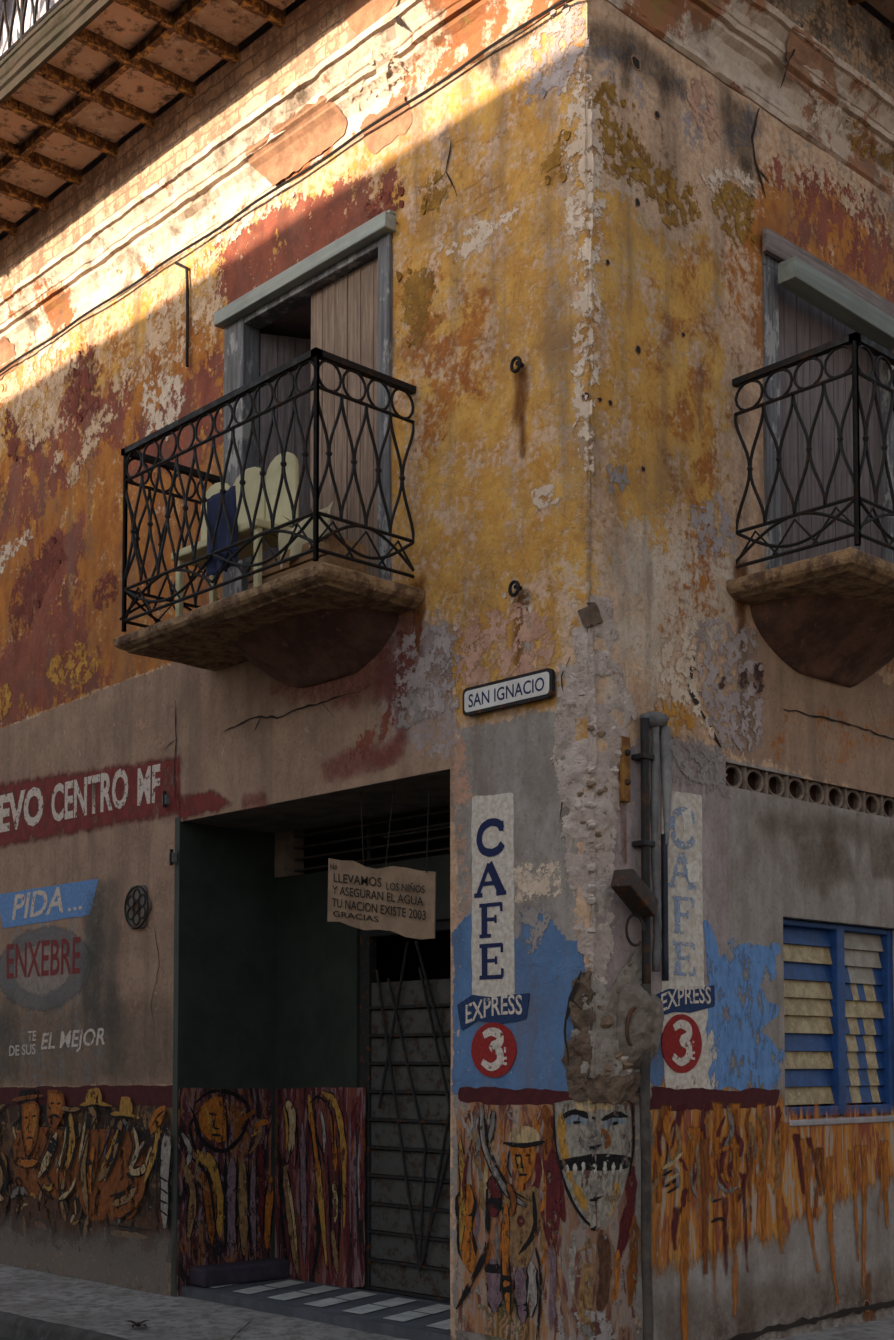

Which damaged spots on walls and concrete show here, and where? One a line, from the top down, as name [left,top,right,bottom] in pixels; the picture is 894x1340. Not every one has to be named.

crack [751,24,803,198]
flaking render [0,43,412,488]
rust [515,369,526,457]
peeling [0,529,68,639]
peeling [92,571,119,612]
peeling [38,641,107,690]
crack [223,684,371,732]
crack [784,709,894,740]
spalling [391,592,767,1104]